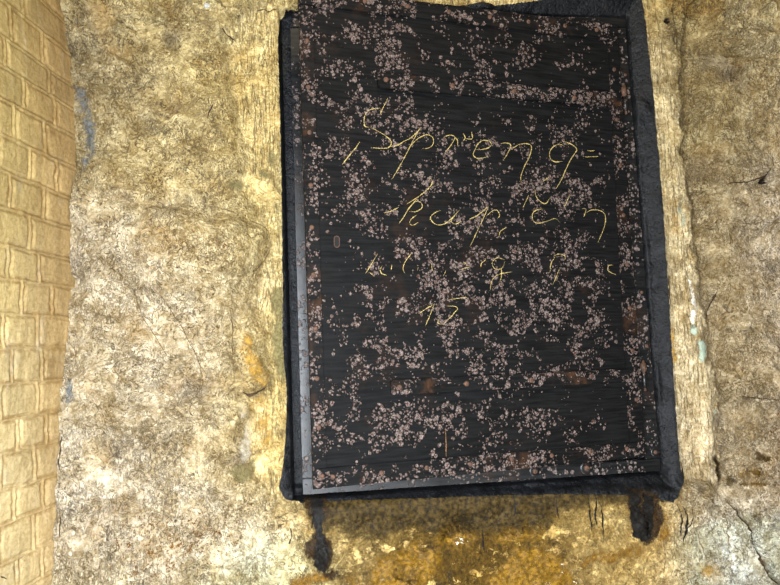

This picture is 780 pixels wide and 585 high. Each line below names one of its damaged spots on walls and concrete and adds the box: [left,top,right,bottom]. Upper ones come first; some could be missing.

corrosion [290,570,328,585]
crack [726,502,779,585]